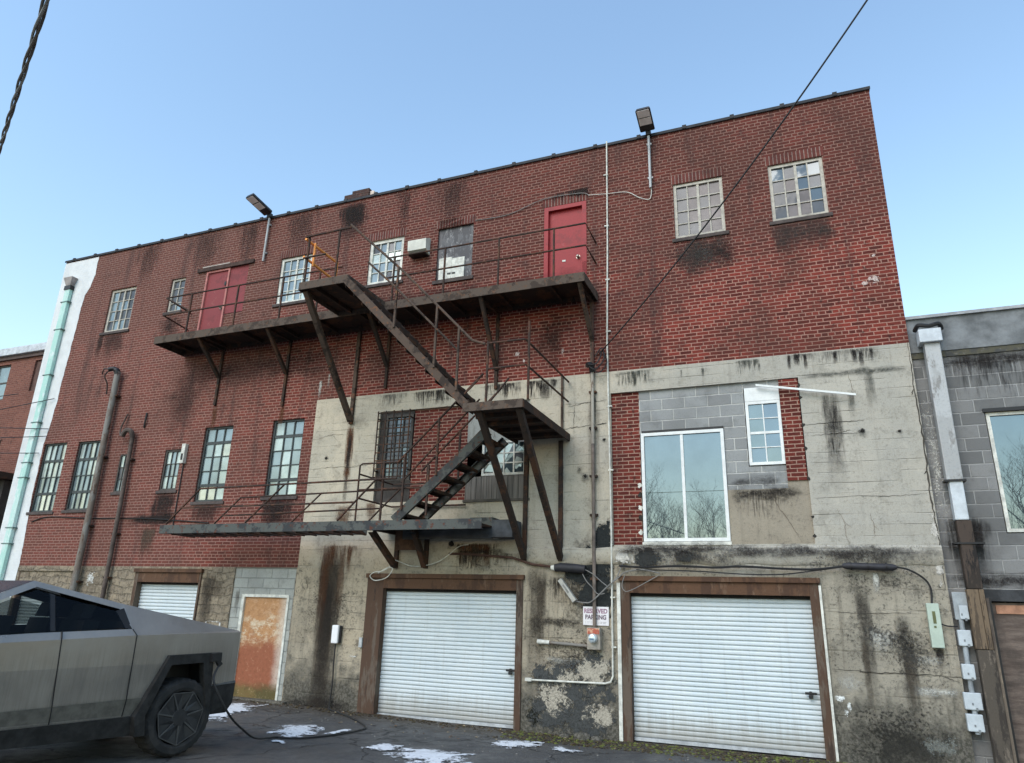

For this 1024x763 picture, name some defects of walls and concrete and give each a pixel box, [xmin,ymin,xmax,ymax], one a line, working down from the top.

damp [339,205,365,228]
damp [822,348,893,375]
damp [739,479,796,499]
damp [622,543,958,763]
peeling [528,650,618,737]